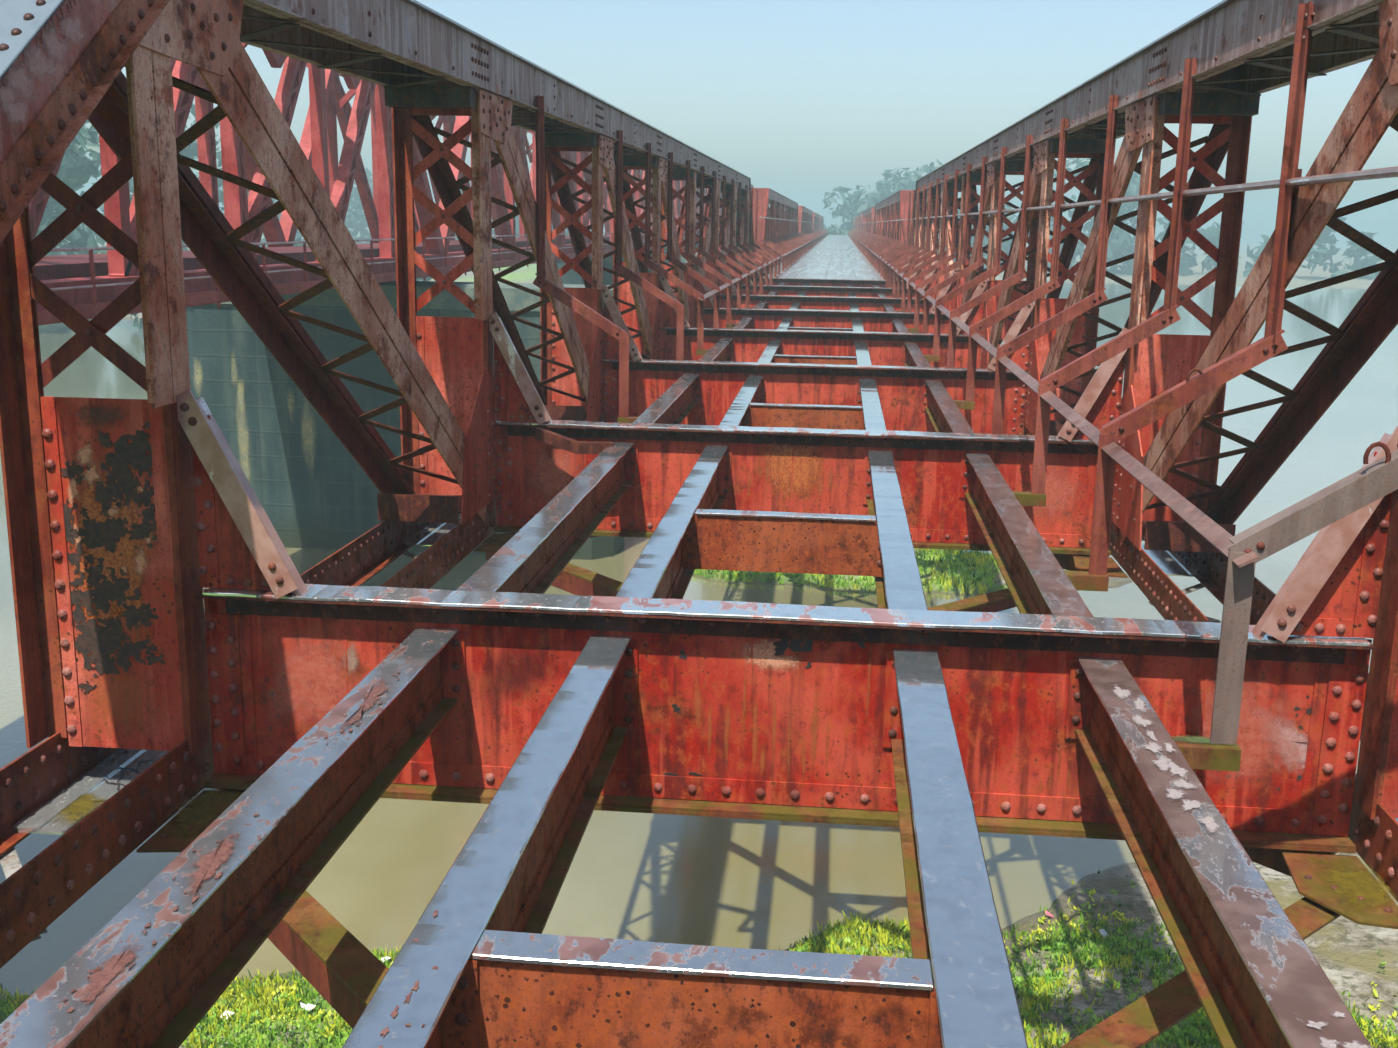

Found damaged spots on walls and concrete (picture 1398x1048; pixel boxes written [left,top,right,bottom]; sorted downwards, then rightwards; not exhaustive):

peeling [69,446,100,503]
peeling [744,639,813,668]
peeling [324,672,400,744]
peeling [1113,684,1219,832]
peeling [172,833,239,911]
peeling [62,922,157,1012]
spalling [378,981,425,1048]
peeling [1307,1011,1369,1048]